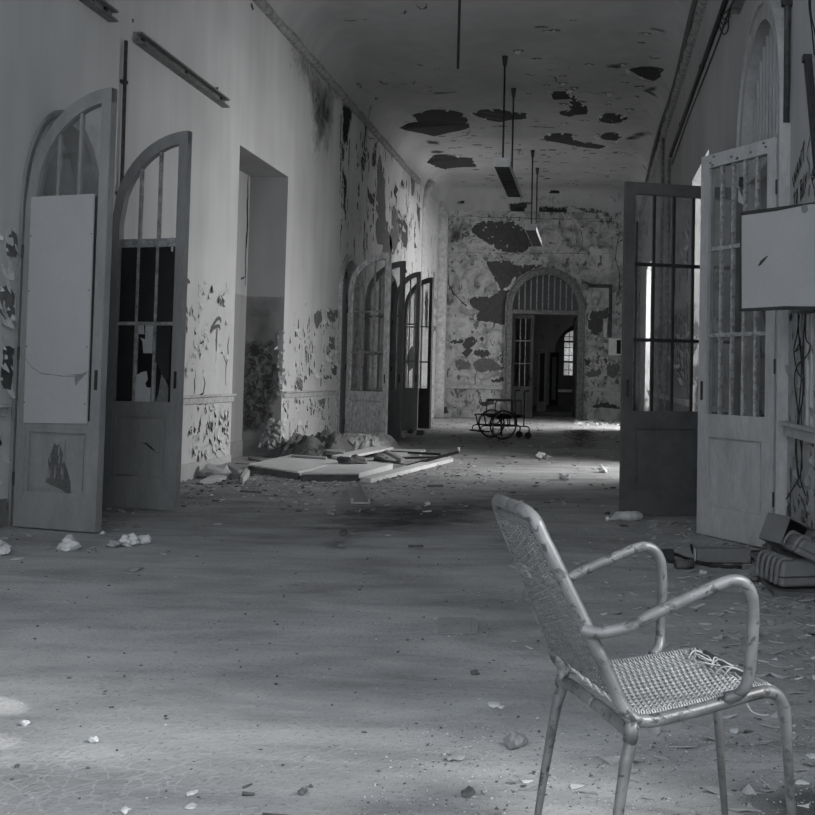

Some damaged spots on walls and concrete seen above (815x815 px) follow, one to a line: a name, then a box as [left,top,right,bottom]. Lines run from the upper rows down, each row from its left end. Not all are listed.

water stain [310,79,330,138]
spalling [400,108,539,170]
spalling [533,66,634,179]
spalling [620,63,666,98]
peeling [340,134,421,263]
peeling [0,227,20,399]
peeling [186,280,228,356]
spalling [447,219,551,383]
spalling [584,292,621,384]
peeling [190,403,231,461]
spalling [592,401,620,410]
peeling [786,443,815,525]